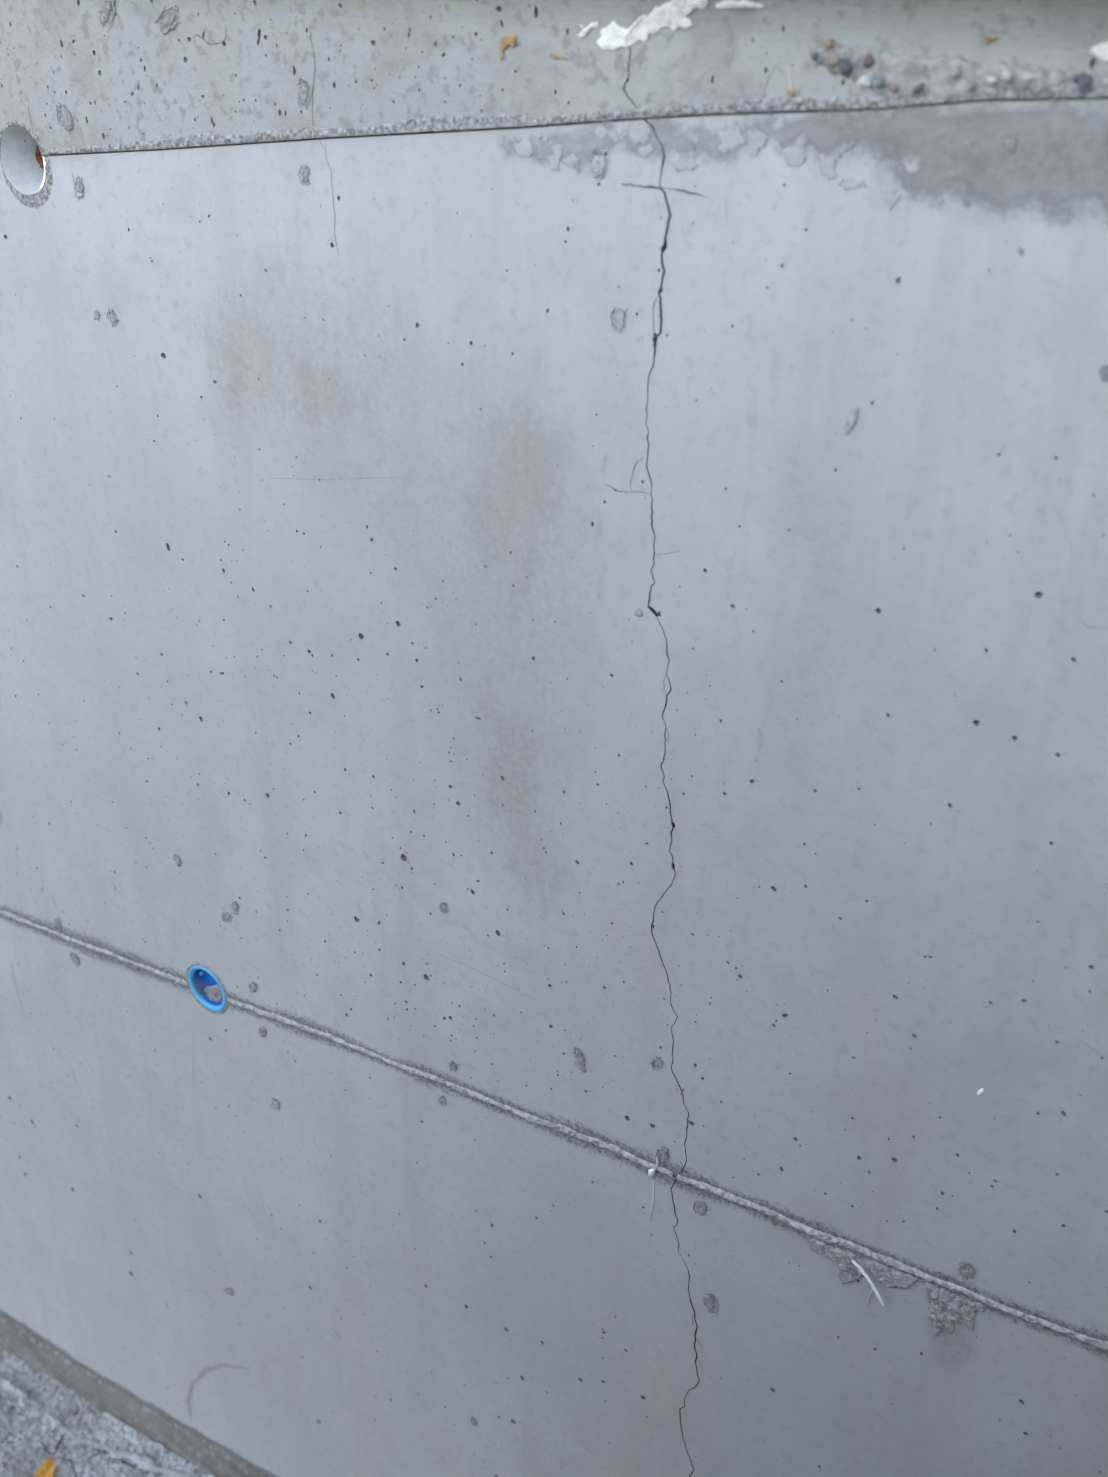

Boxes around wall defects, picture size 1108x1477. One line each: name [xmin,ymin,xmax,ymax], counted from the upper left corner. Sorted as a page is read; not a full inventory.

peeling [715,0,764,9]
corrosion [35,145,44,171]
crack [604,0,707,1477]
peeling [807,1235,987,1336]